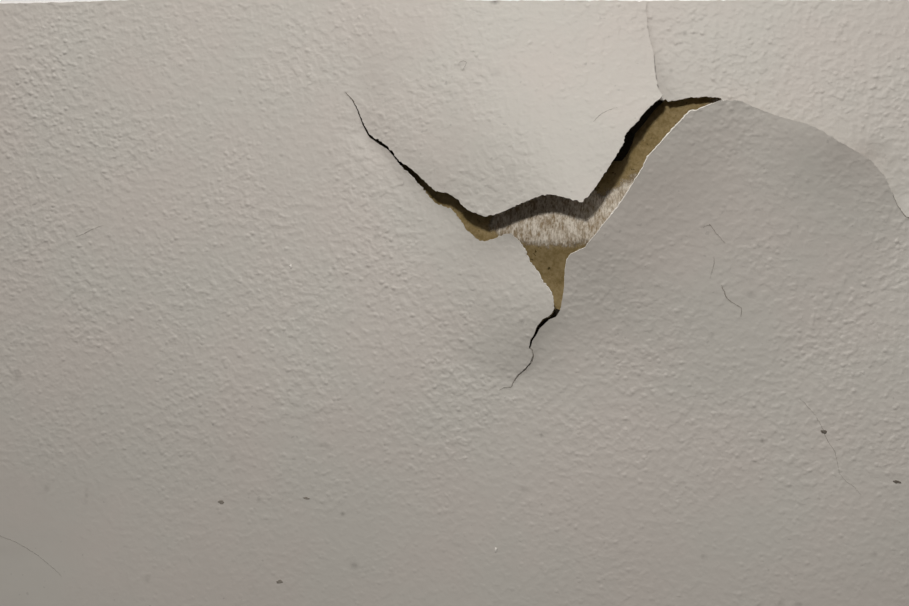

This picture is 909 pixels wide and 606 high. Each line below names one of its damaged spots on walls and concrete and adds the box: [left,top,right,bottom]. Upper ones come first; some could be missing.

peeling [334,0,721,391]